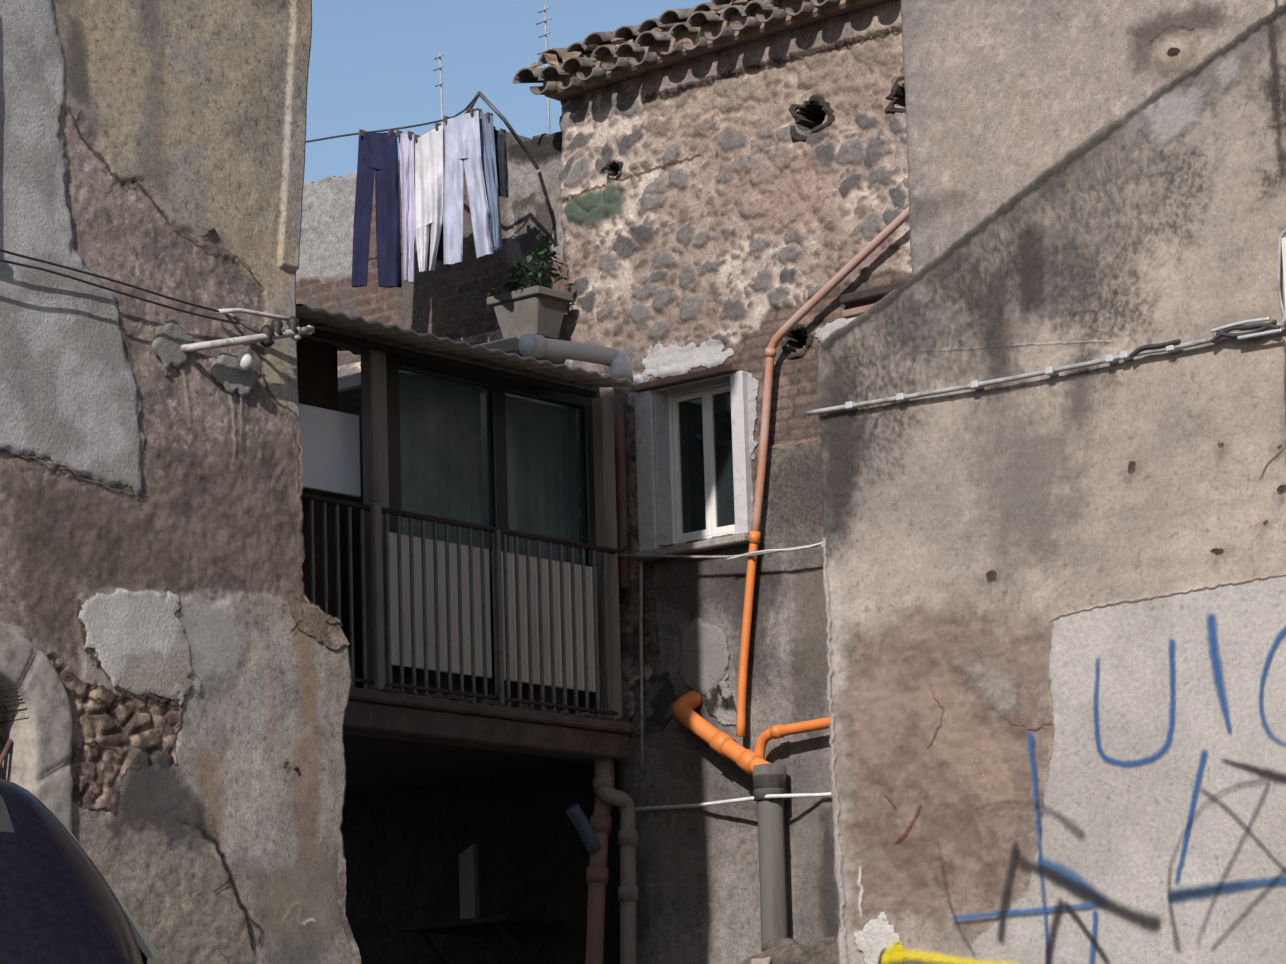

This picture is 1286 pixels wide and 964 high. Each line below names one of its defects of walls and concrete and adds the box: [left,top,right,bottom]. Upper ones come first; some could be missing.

leakage [1131,4,1219,46]
leakage [1260,6,1286,184]
peeling [0,0,146,496]
peeling [627,336,734,415]
spalling [781,318,847,360]
leakage [763,140,1202,556]
crack [1260,338,1286,478]
spalling [287,421,349,650]
crack [1051,574,1286,622]
peeling [53,588,247,815]
crack [178,819,262,951]